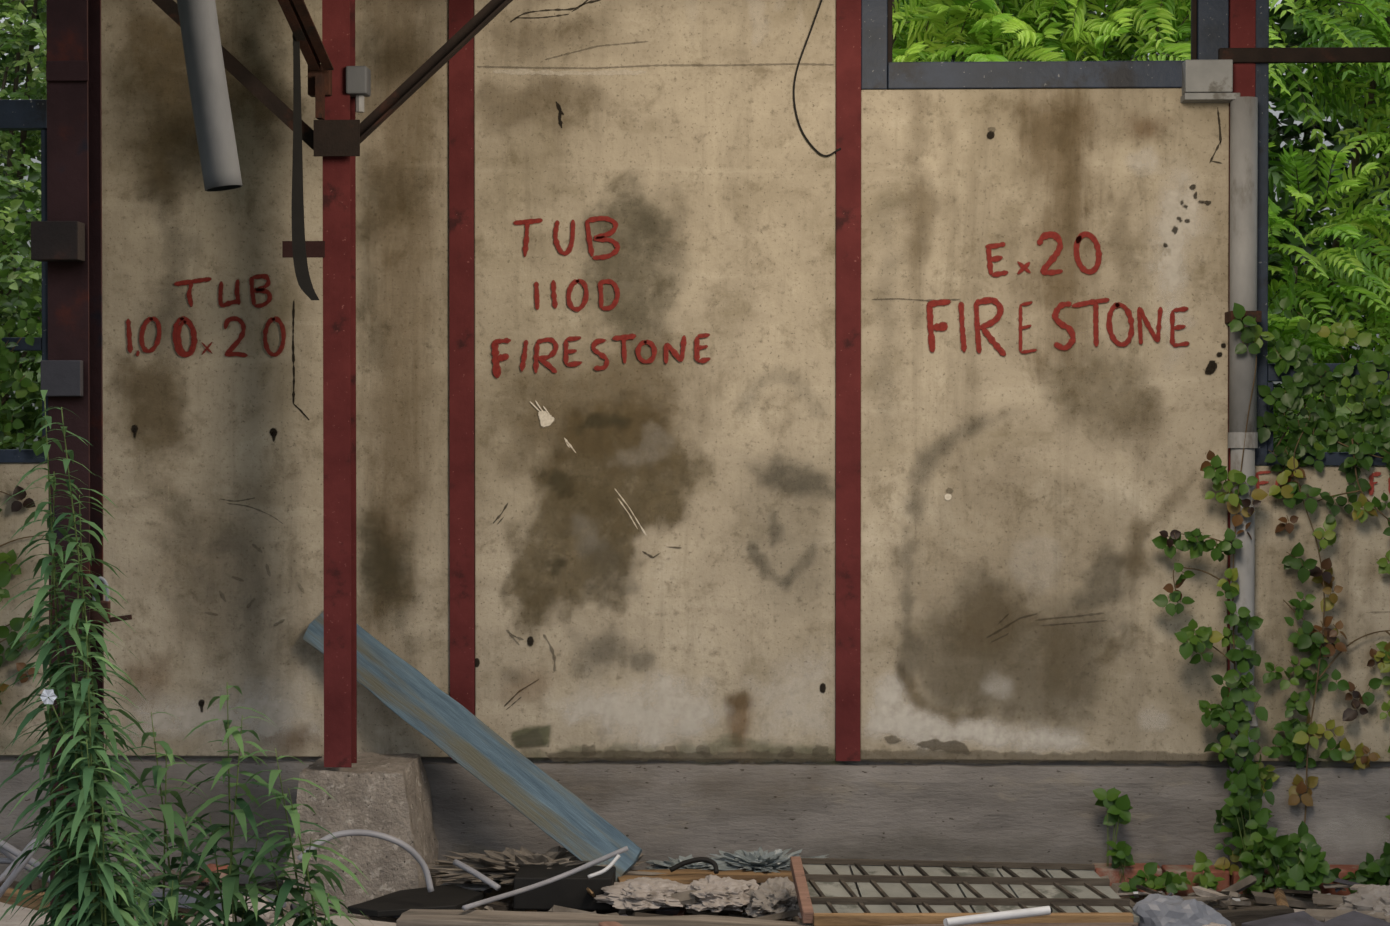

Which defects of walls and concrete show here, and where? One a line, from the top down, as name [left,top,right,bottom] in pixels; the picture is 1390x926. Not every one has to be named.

leakage [225,70,275,118]
leakage [511,406,690,622]
leakage [871,682,1076,745]